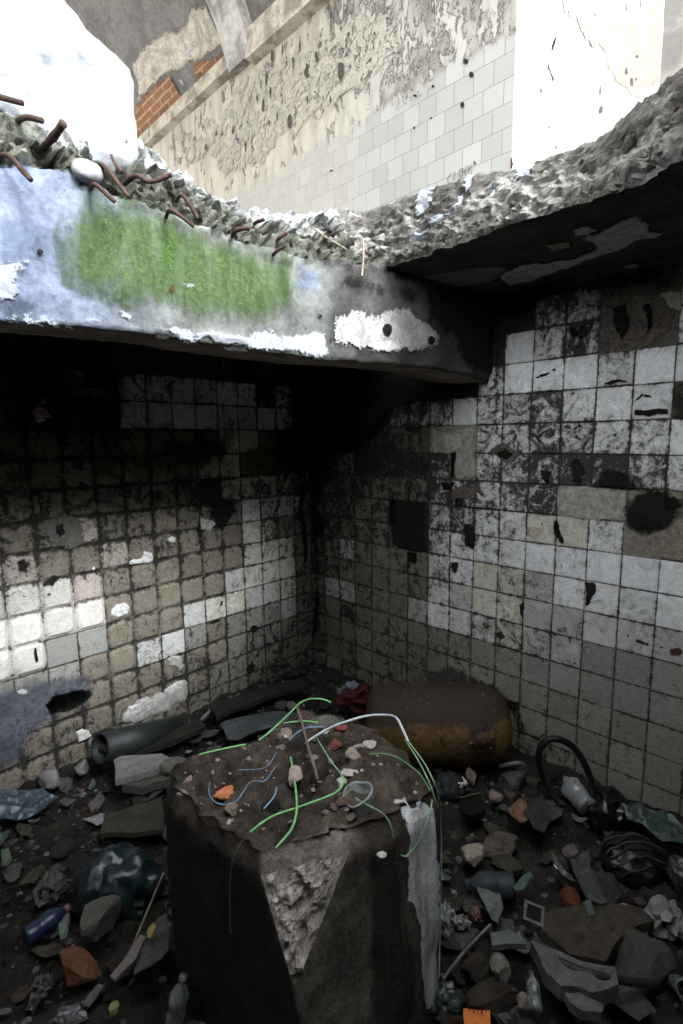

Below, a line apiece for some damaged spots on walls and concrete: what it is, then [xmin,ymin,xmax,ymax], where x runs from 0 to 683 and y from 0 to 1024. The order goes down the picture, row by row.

spalling [0,94,68,151]
peeling [88,5,404,203]
spalling [0,152,33,182]
peeling [417,217,662,288]
water stain [162,326,330,360]
peeling [330,305,440,352]
peeling [600,291,682,353]
peeling [383,488,428,576]
peeling [557,486,683,562]
spalling [45,689,92,714]
spalling [76,729,92,742]
spalling [261,851,349,975]